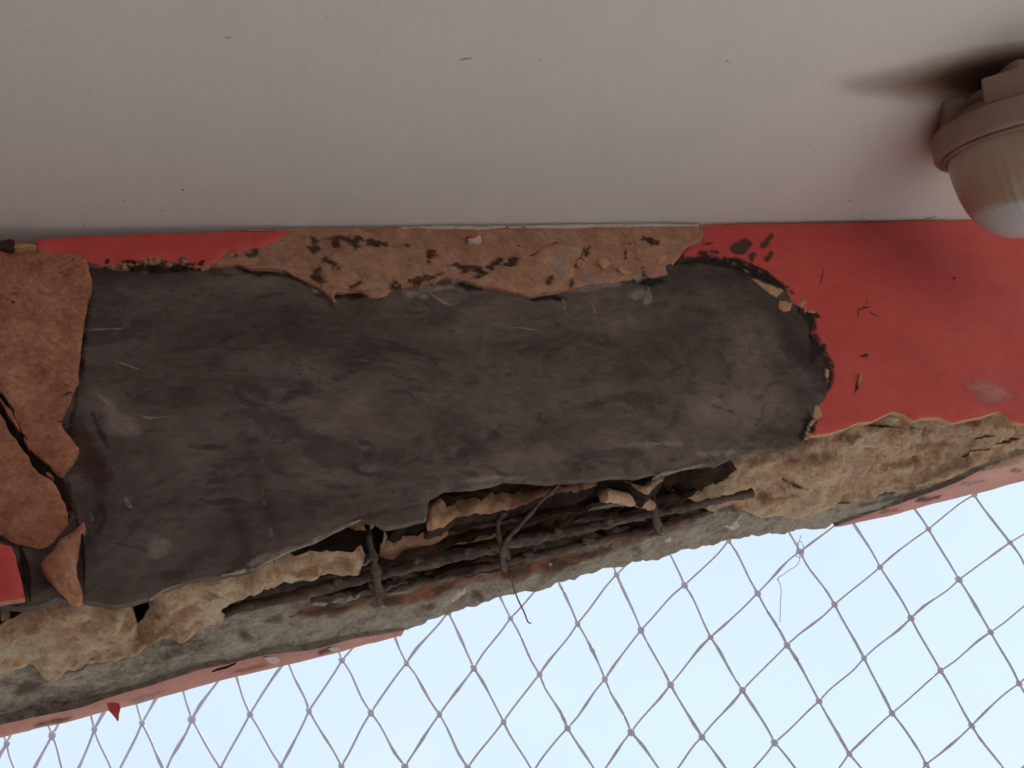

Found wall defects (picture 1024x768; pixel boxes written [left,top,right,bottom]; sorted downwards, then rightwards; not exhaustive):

peeling [140,224,705,307]
crack [0,393,86,601]
corrosion [301,539,639,617]
spalling [0,239,1024,683]